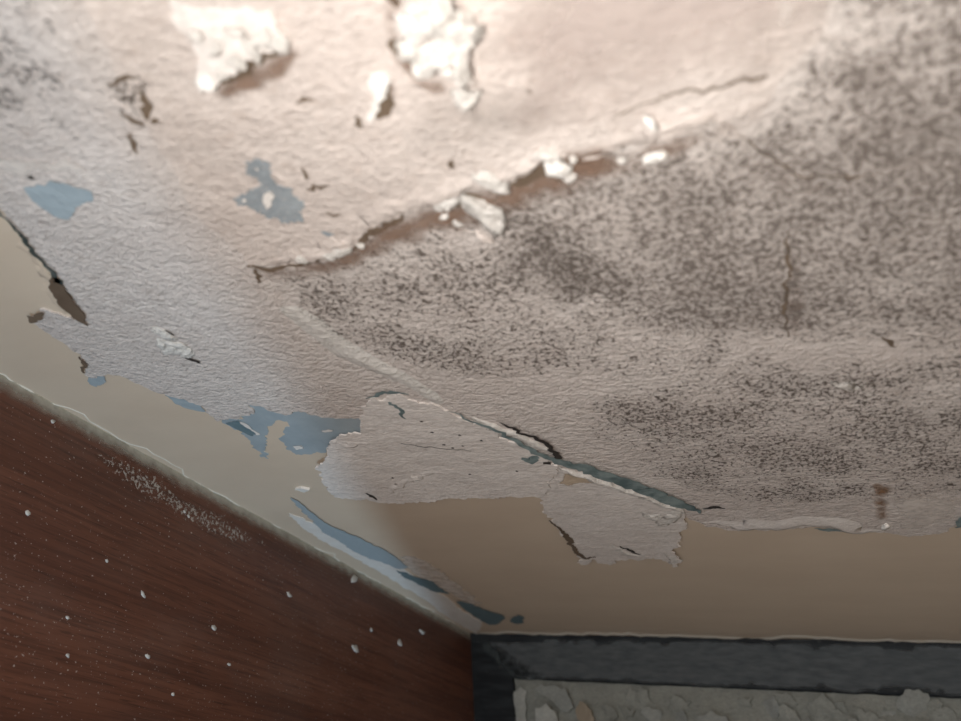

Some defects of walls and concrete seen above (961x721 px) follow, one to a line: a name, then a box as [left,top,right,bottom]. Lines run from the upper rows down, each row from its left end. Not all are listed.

flaking render [103,74,160,154]
flaking render [169,0,295,95]
flaking render [386,0,484,112]
flaking render [246,72,767,284]
damp [283,0,961,505]
peeling [0,210,961,641]